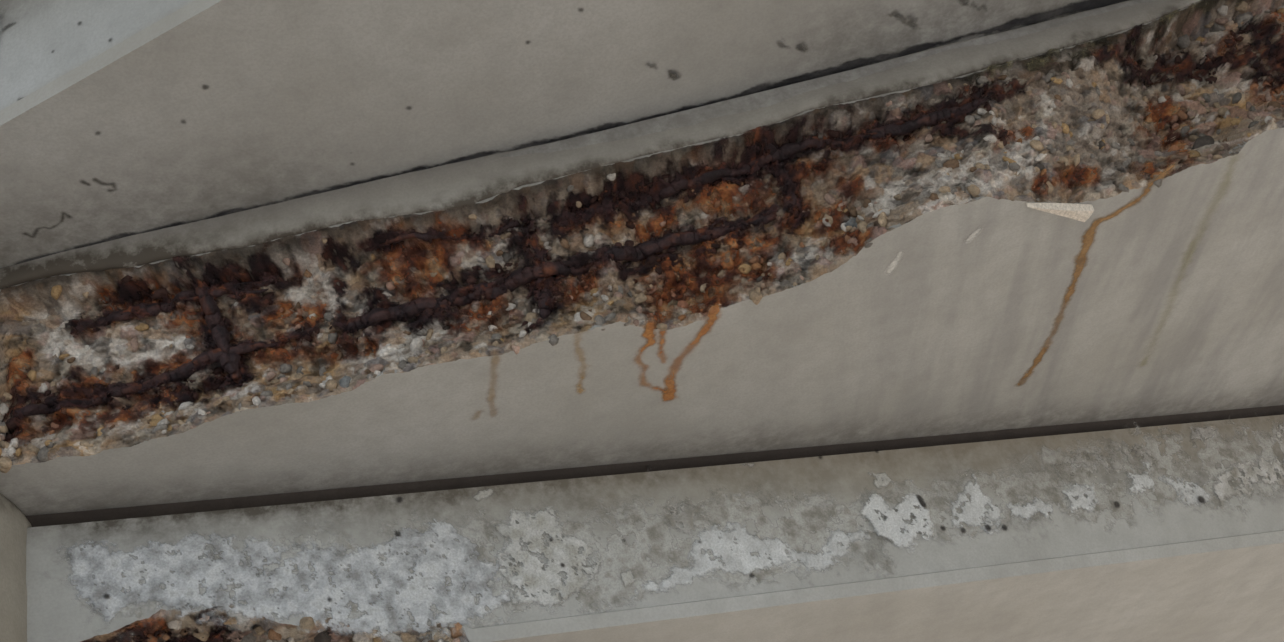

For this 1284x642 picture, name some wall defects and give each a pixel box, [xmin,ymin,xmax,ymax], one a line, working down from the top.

spalling [0,0,1284,473]
rust [637,304,720,401]
rust [1017,165,1174,386]
water stain [190,554,255,622]
peeling [67,507,600,642]
water stain [246,426,1284,642]